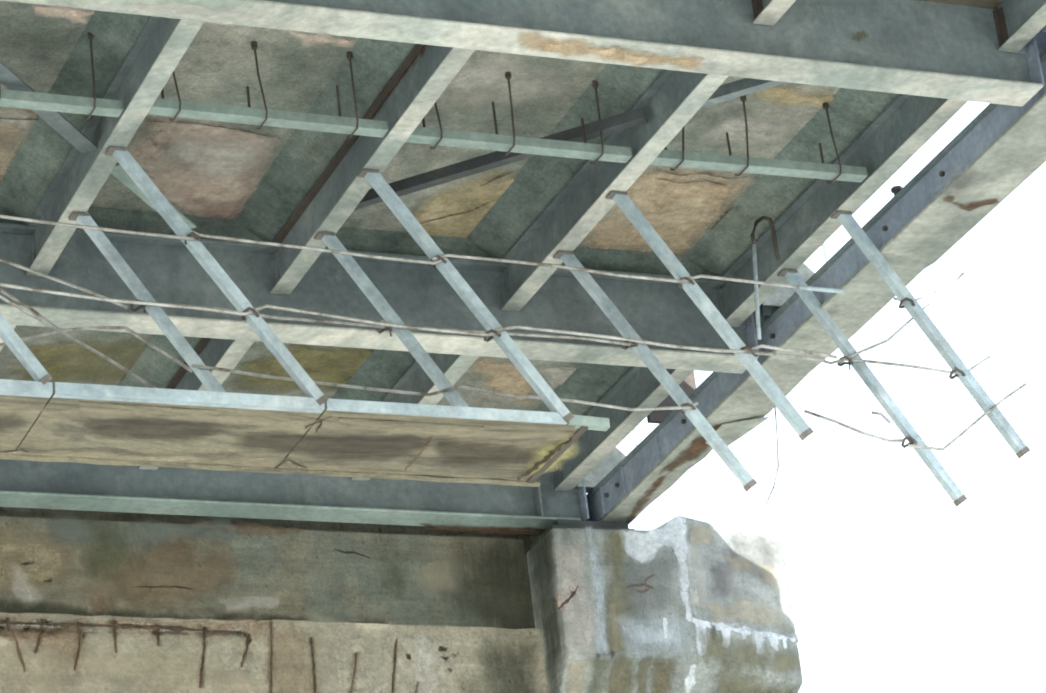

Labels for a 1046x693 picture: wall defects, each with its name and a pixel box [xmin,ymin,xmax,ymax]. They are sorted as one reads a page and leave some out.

rust [944,196,998,211]
water stain [95,419,220,440]
rust [628,425,721,523]
water stain [108,548,228,599]
water stain [562,516,797,693]
spalling [0,618,273,693]
spalling [334,634,452,693]